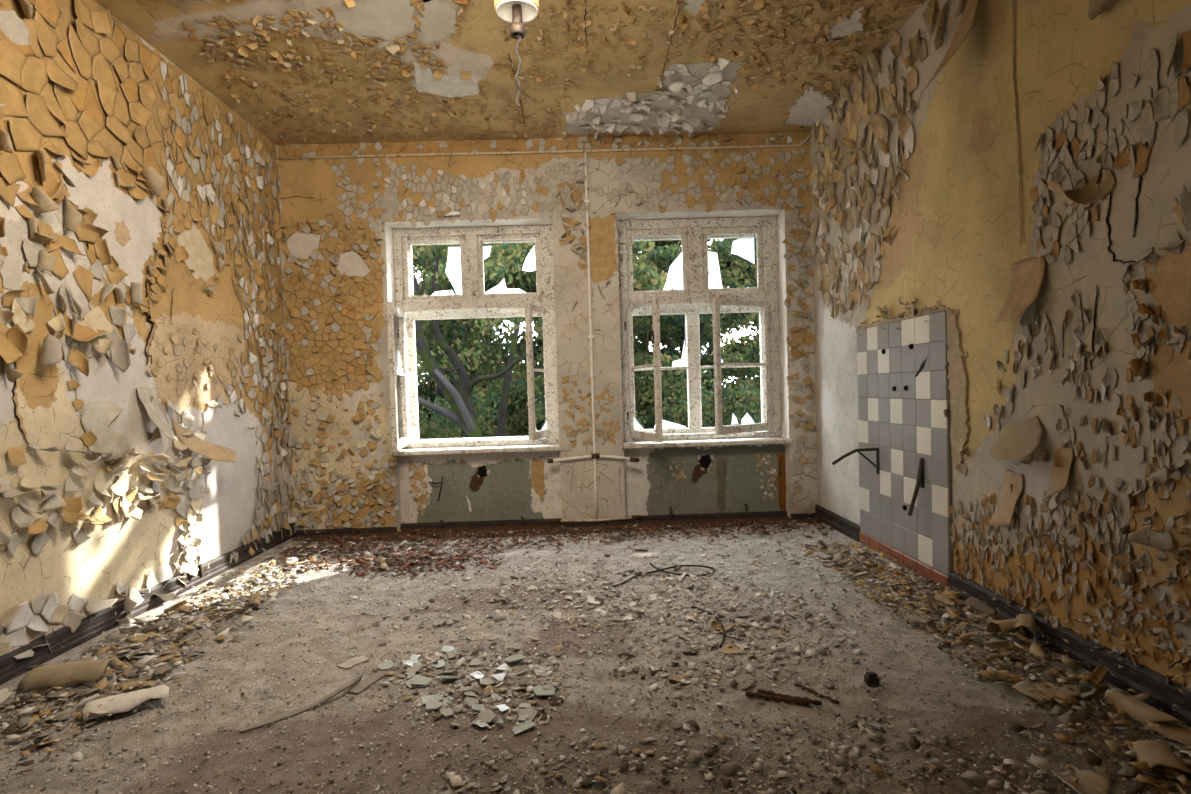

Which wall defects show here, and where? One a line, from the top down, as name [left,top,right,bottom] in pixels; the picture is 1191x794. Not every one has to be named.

peeling [0,0,970,668]
peeling [1030,30,1191,266]
crack [1089,62,1190,369]